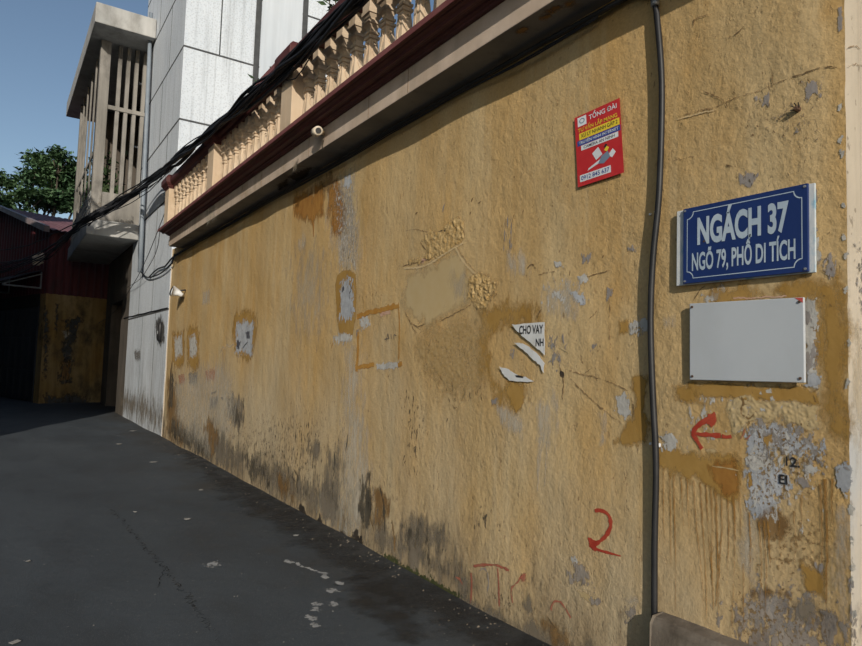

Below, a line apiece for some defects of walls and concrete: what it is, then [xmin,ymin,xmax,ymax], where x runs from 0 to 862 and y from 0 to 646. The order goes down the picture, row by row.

crack [676,43,860,120]
peeling [235,318,254,358]
peeling [333,316,372,344]
water stain [117,352,492,640]
rust [659,446,802,626]
peeling [659,383,855,515]